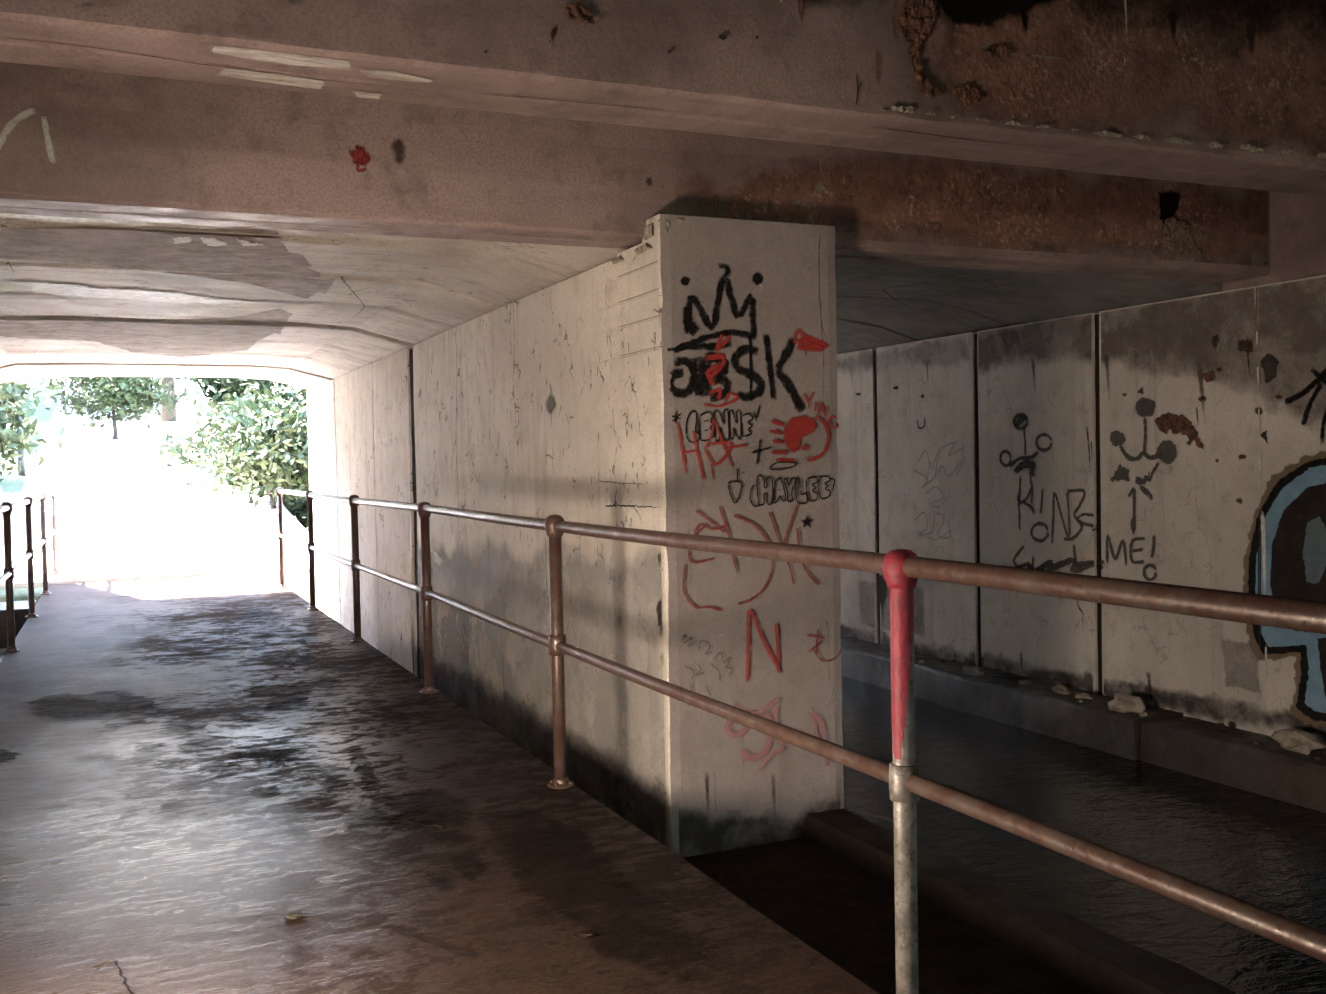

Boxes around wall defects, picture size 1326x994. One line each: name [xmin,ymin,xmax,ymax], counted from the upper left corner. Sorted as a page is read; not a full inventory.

spalling [564,1,599,26]
spalling [881,0,1264,152]
spalling [1154,412,1204,449]
water stain [413,545,841,858]
water stain [0,749,22,763]
crack [115,960,134,994]